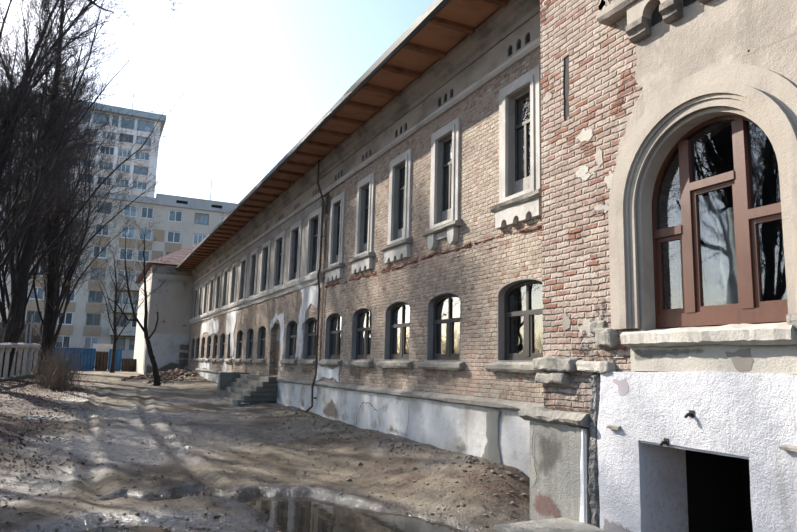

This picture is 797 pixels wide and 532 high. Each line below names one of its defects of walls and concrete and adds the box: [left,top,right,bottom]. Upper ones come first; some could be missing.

water stain [540,438,558,469]